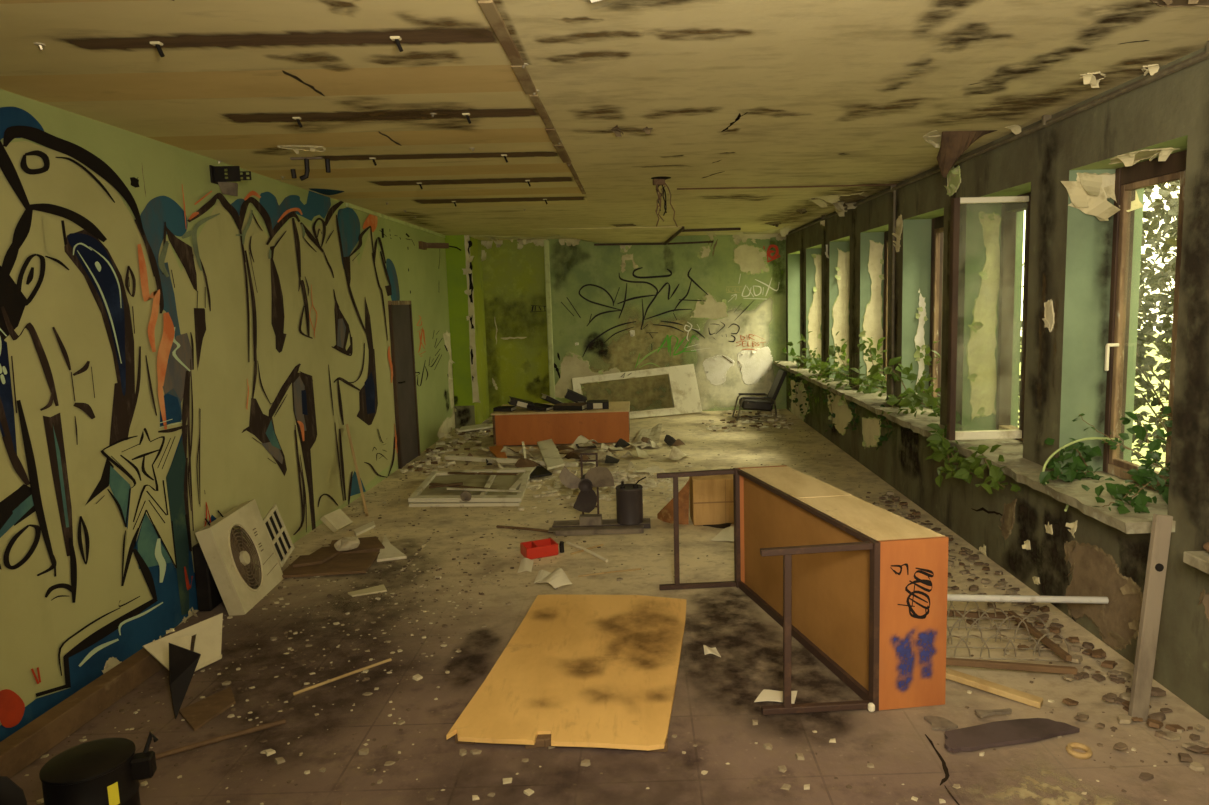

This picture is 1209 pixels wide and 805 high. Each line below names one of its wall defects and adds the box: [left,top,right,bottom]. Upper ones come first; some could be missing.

damp [62,19,527,70]
damp [539,17,638,62]
damp [937,3,1177,123]
damp [223,103,539,128]
peeling [1061,147,1178,221]
flaking render [697,221,795,275]
damp [582,318,690,412]
flaking render [914,288,928,394]
flaking render [966,211,1001,421]
peeling [827,393,881,448]
damp [1006,501,1069,607]
crack [925,734,960,805]